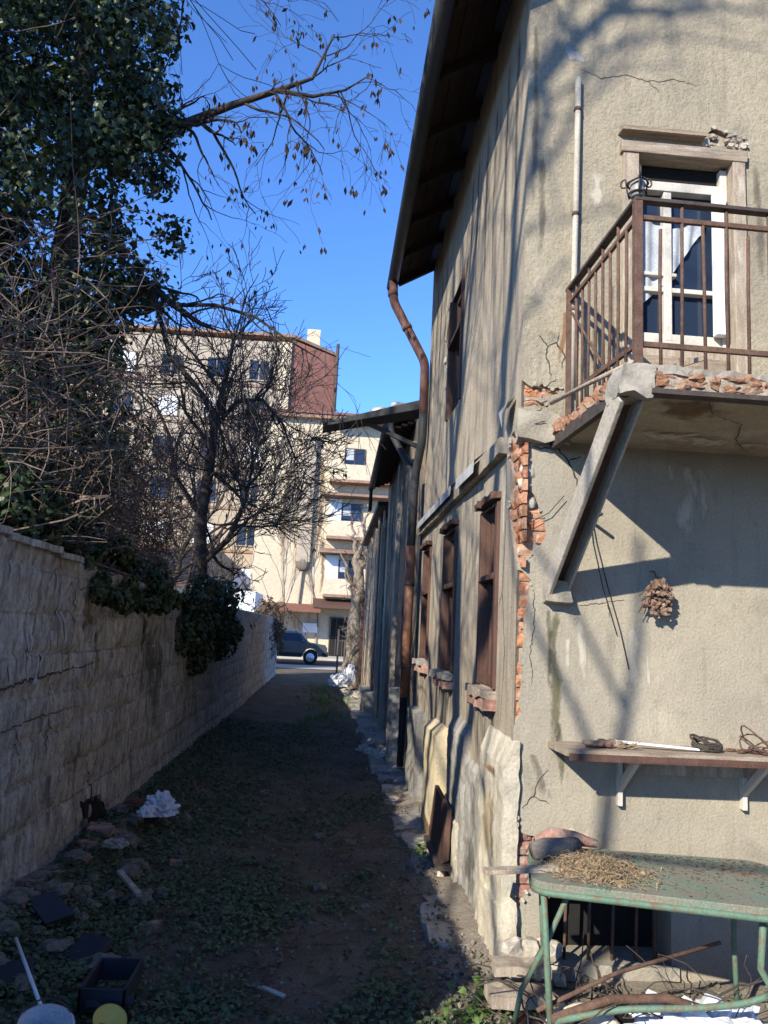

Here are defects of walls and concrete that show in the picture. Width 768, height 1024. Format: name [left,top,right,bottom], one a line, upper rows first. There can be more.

crack [581,69,696,91]
spalling [524,382,563,410]
crack [523,335,566,404]
spalling [552,380,608,435]
spalling [654,365,768,396]
spalling [507,438,546,721]
crack [0,589,100,784]
water stain [547,612,586,772]